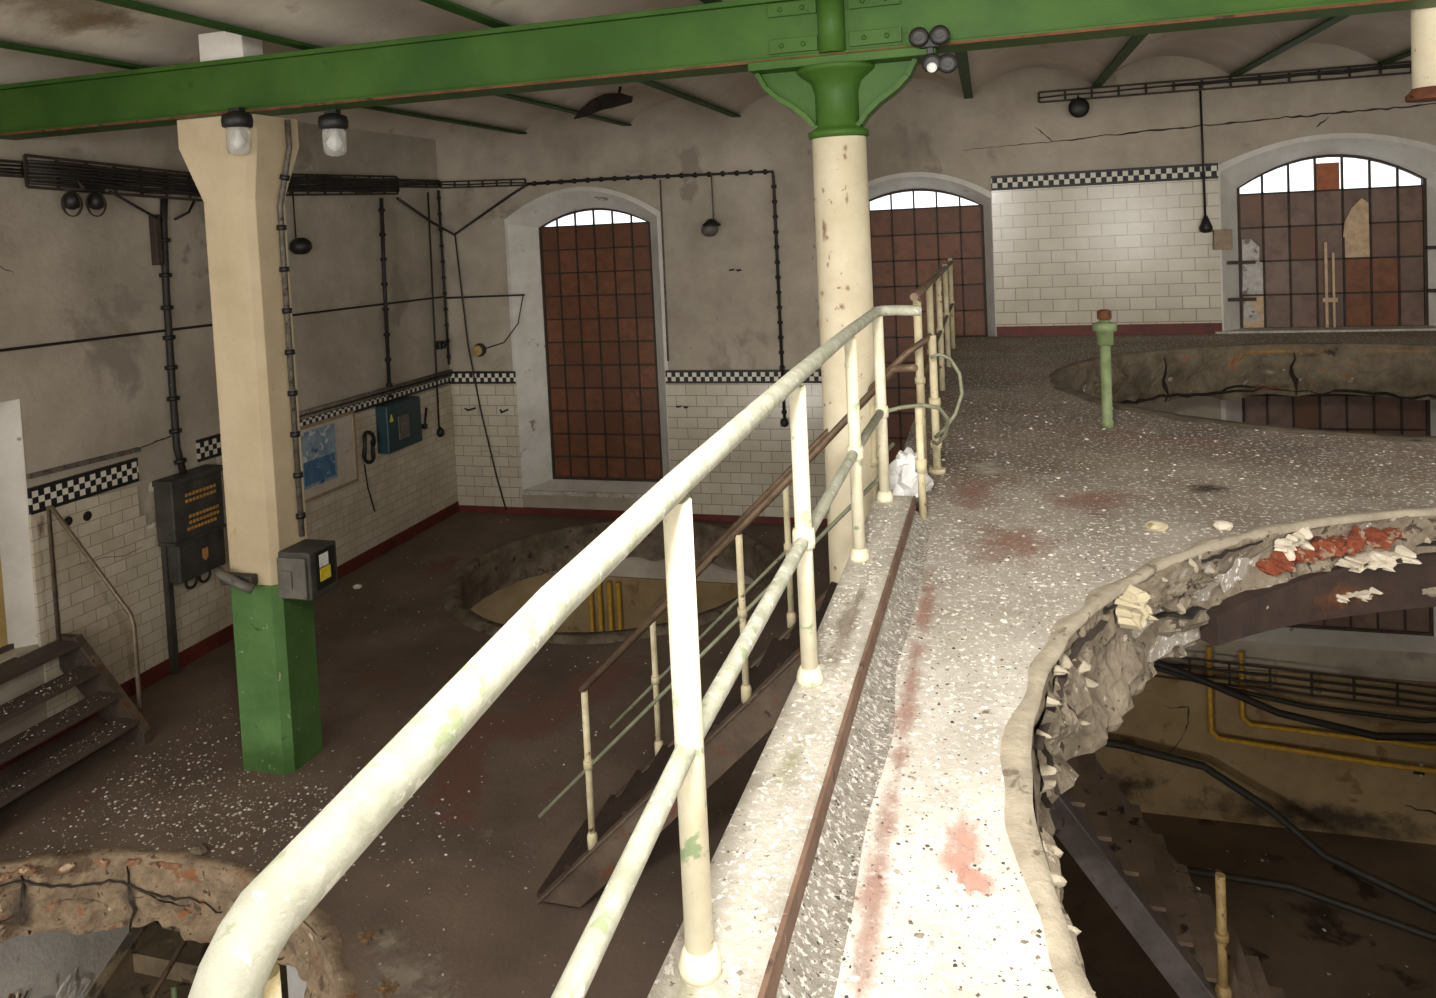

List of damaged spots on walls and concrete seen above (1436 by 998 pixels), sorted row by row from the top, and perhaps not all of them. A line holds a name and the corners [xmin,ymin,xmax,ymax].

crack [1113,352,1436,404]
spalling [1114,525,1436,646]
spalling [1036,648,1099,803]
flaking render [0,862,76,882]
crack [0,866,223,935]